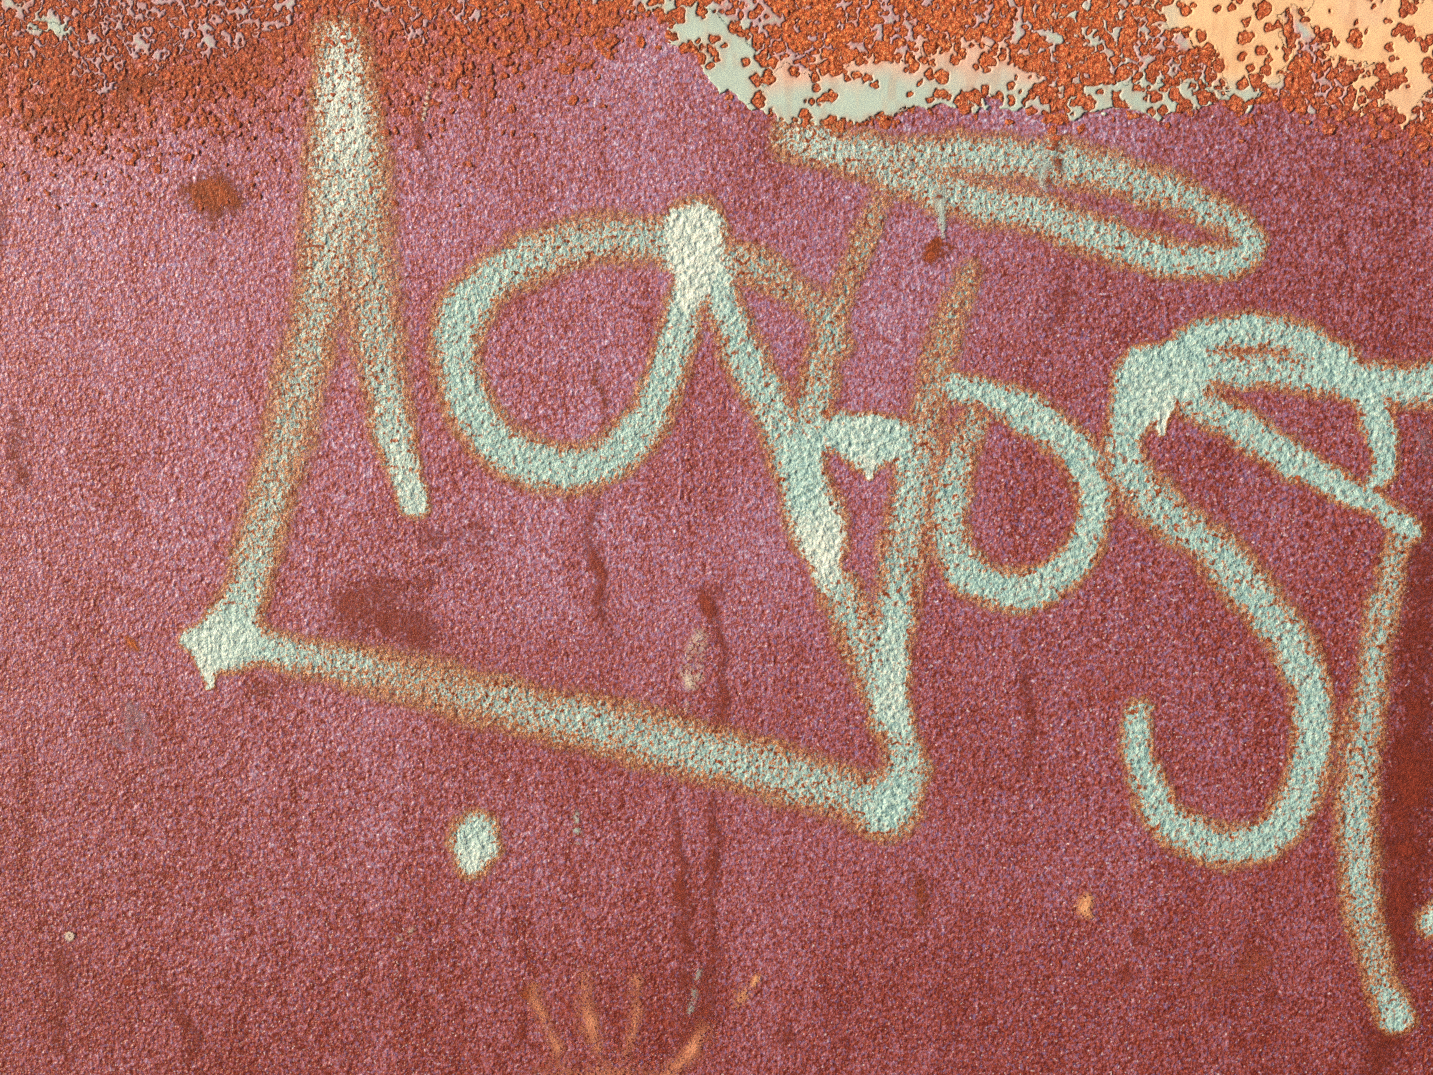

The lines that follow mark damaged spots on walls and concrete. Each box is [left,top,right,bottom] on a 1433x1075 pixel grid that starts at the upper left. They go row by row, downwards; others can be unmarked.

rust [0,0,703,225]
peeling [659,0,1049,129]
rust [686,0,1433,205]
peeling [1063,0,1433,136]